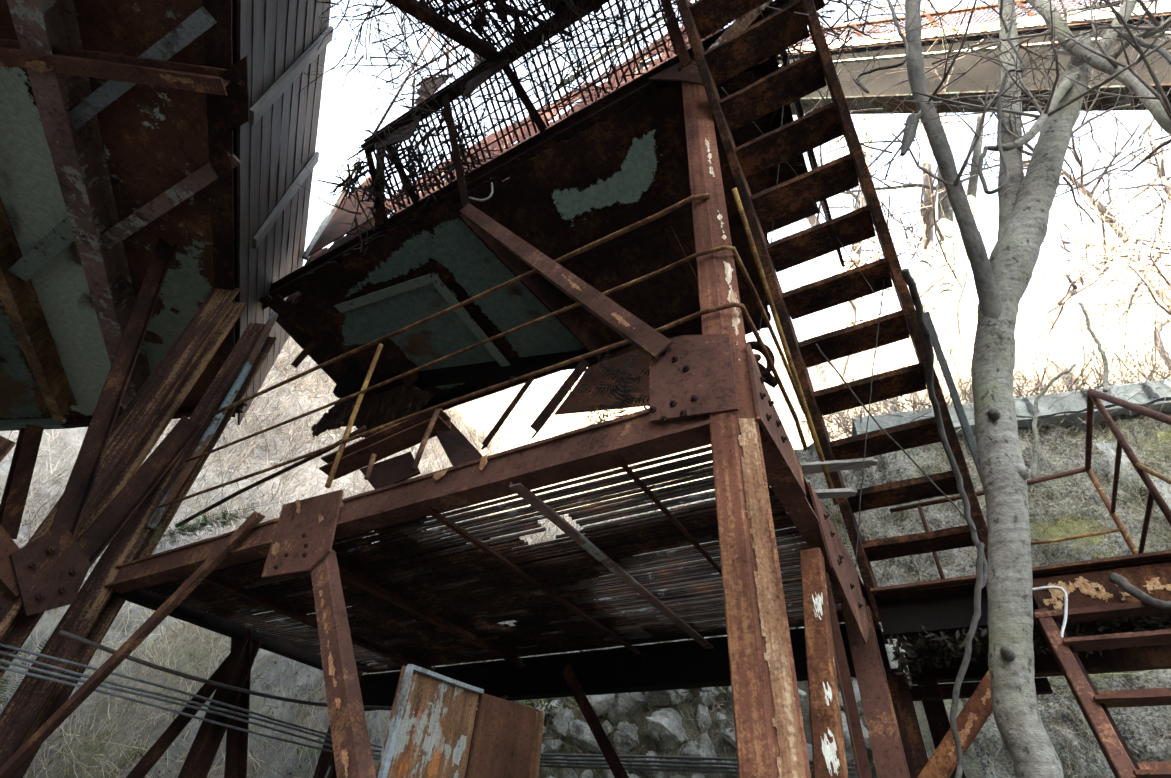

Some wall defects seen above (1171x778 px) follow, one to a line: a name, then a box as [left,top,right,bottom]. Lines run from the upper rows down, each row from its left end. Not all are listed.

peeling [552,129,662,226]
peeling [341,218,585,371]
peeling [812,592,823,619]
peeling [823,681,832,706]
peeling [422,702,437,757]
peeling [451,735,467,778]
peeling [821,729,840,776]